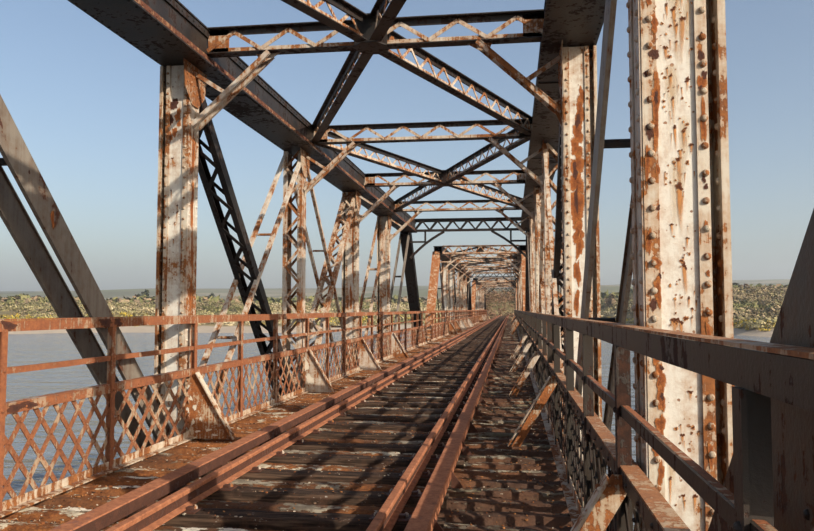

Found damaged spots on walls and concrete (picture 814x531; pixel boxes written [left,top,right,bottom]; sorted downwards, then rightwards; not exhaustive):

rust [170,98,181,142]
rust [643,0,707,237]
rust [573,233,584,316]
rust [646,226,711,335]
rust [98,318,122,328]
rust [7,401,38,414]